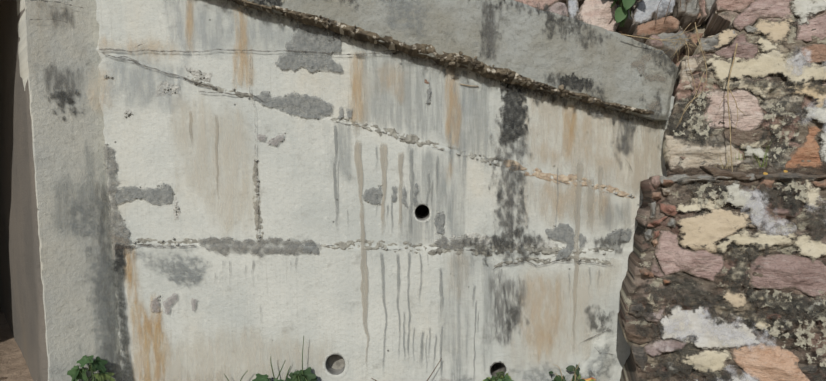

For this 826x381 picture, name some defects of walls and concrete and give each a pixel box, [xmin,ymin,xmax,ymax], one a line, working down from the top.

damp [45,67,79,113]
crack [101,44,395,105]
crack [252,125,264,241]
peeling [198,236,319,256]
damp [354,143,369,355]
damp [376,145,414,225]
spalling [228,0,665,119]
damp [463,73,605,260]
peeling [513,223,586,260]
damp [662,90,730,147]
damp [102,244,133,381]
damp [397,254,443,370]